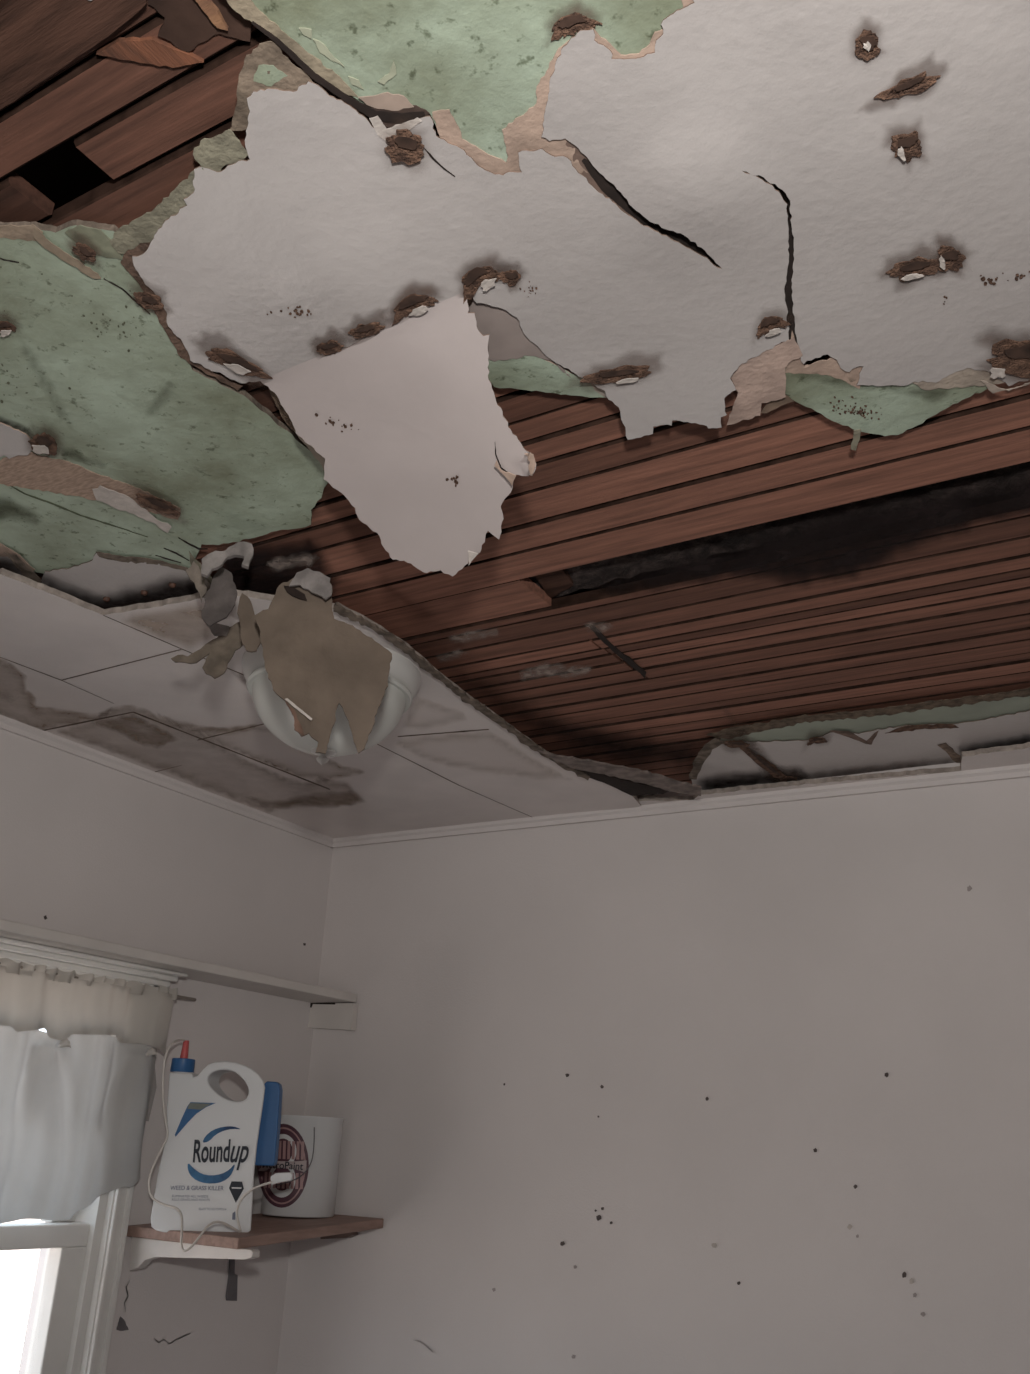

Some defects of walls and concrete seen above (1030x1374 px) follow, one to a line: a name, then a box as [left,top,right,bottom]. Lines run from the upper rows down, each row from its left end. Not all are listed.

crack [252,21,455,177]
peeling [0,0,1030,601]
crack [582,158,720,267]
crack [744,171,798,344]
damp [604,477,1030,590]
peeling [689,687,1030,790]